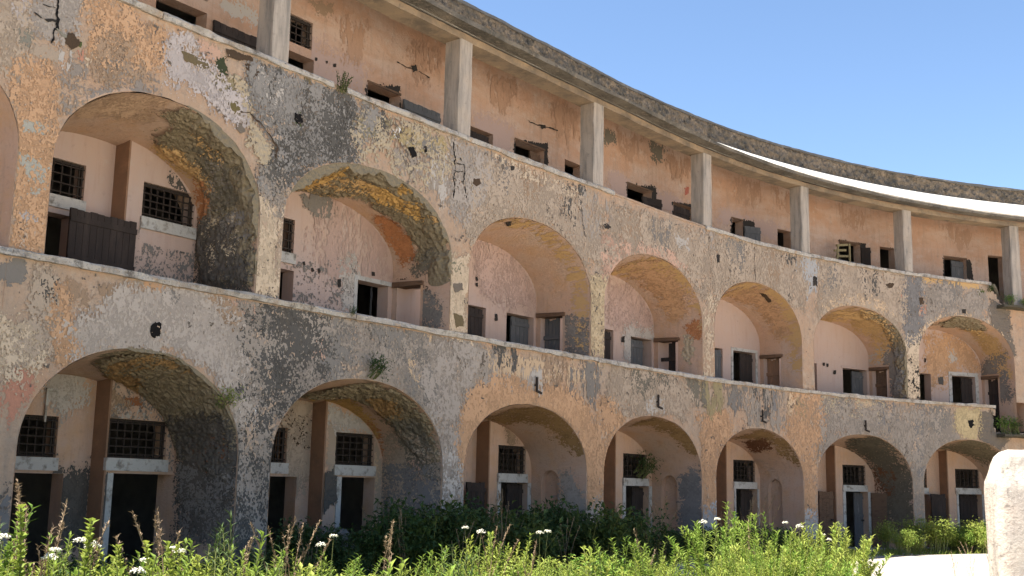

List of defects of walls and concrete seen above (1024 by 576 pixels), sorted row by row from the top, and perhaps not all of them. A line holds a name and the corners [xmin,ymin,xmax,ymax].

crack [34,0,67,43]
spalling [7,0,512,340]
crack [453,142,467,198]
water stain [110,54,1000,565]
spalling [760,273,1023,420]
spalling [965,259,974,280]